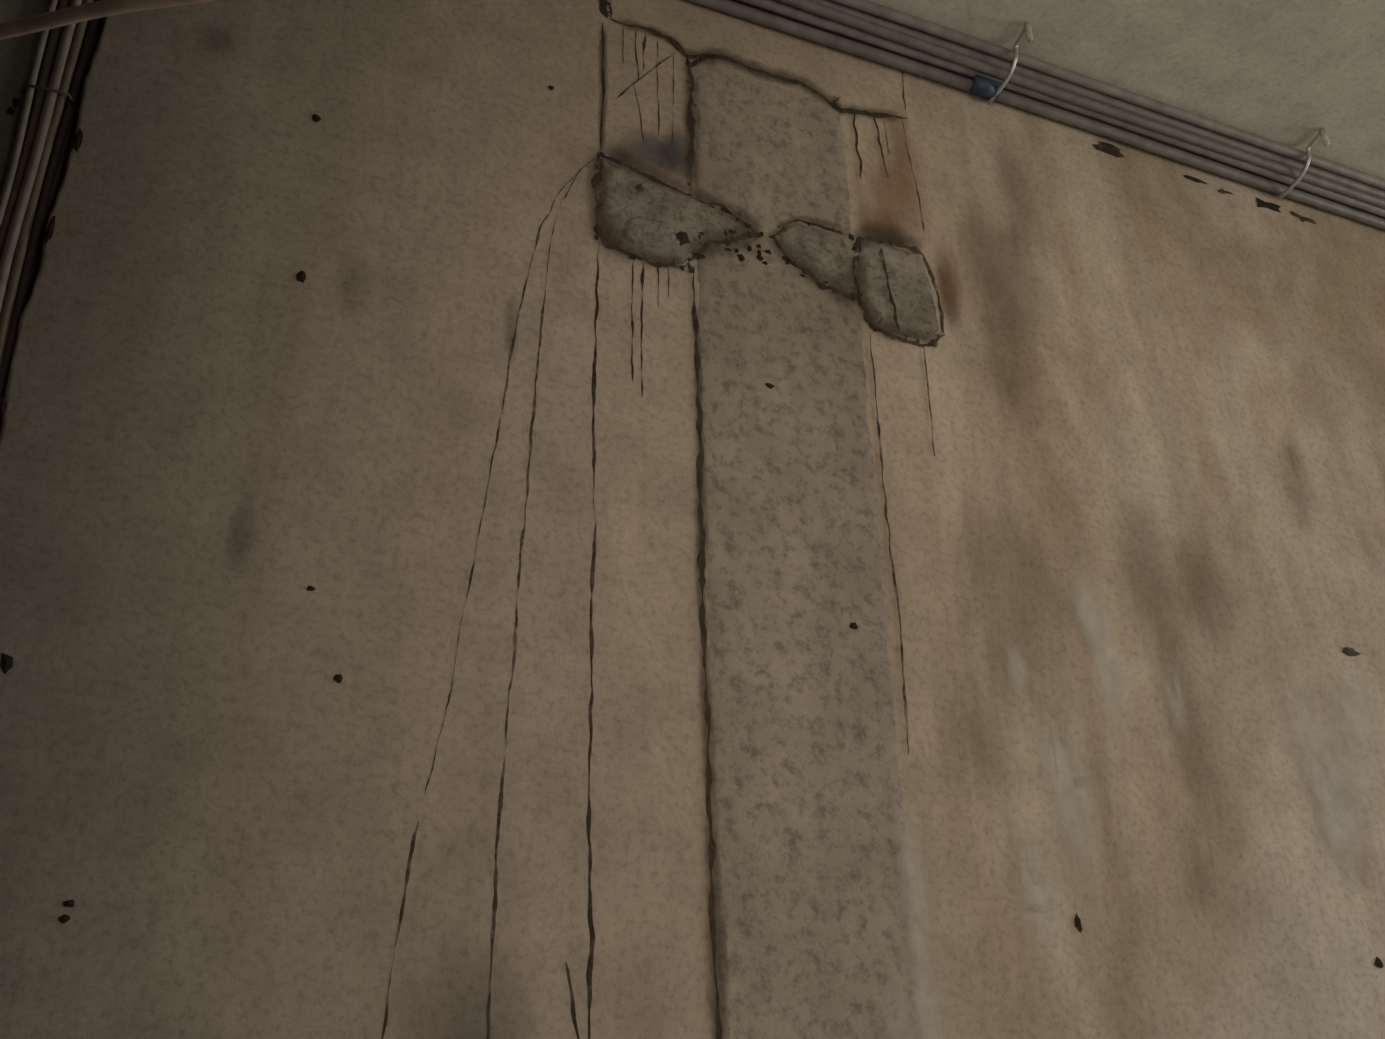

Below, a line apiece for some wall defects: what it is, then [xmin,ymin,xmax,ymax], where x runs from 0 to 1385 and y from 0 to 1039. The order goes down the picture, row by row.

crack [381,0,924,1039]
crack [923,343,935,457]